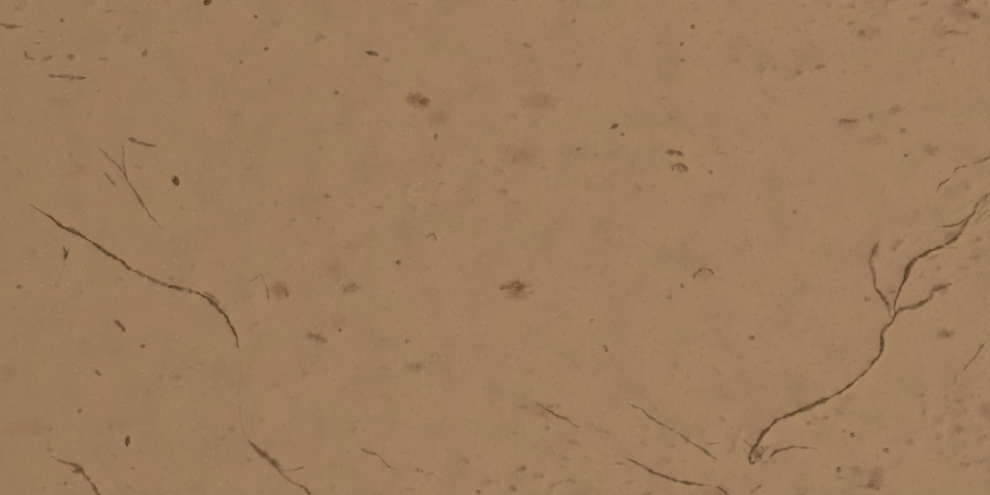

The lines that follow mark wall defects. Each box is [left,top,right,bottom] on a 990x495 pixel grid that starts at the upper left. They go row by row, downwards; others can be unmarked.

crack [48,215,131,270]
crack [153,280,238,346]
crack [750,211,975,464]